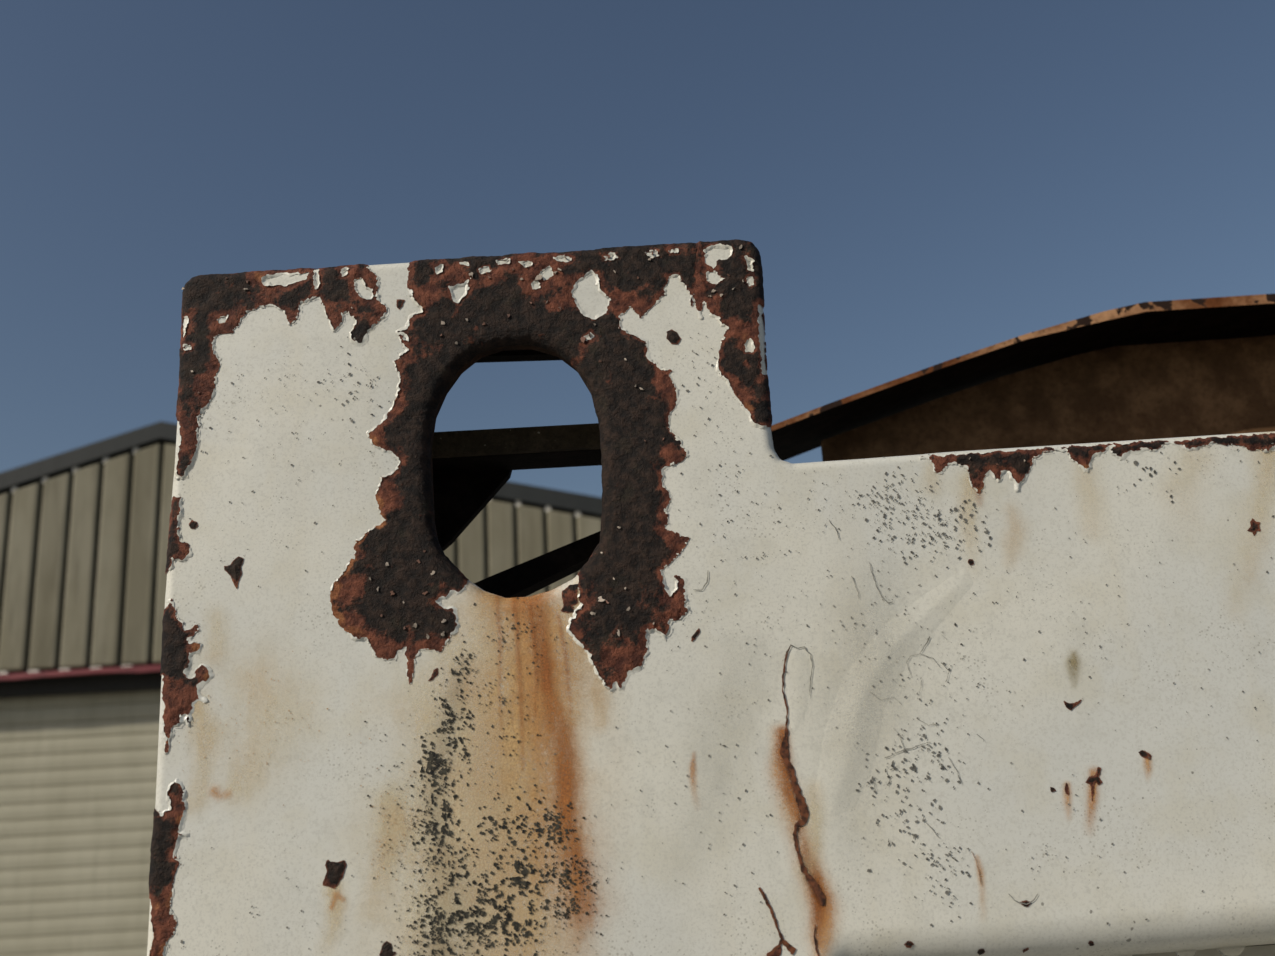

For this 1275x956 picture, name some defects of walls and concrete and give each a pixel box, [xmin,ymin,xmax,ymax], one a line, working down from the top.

rust [160,239,772,956]
rust [919,433,1275,495]
rust [148,778,190,956]
crack [758,644,825,956]